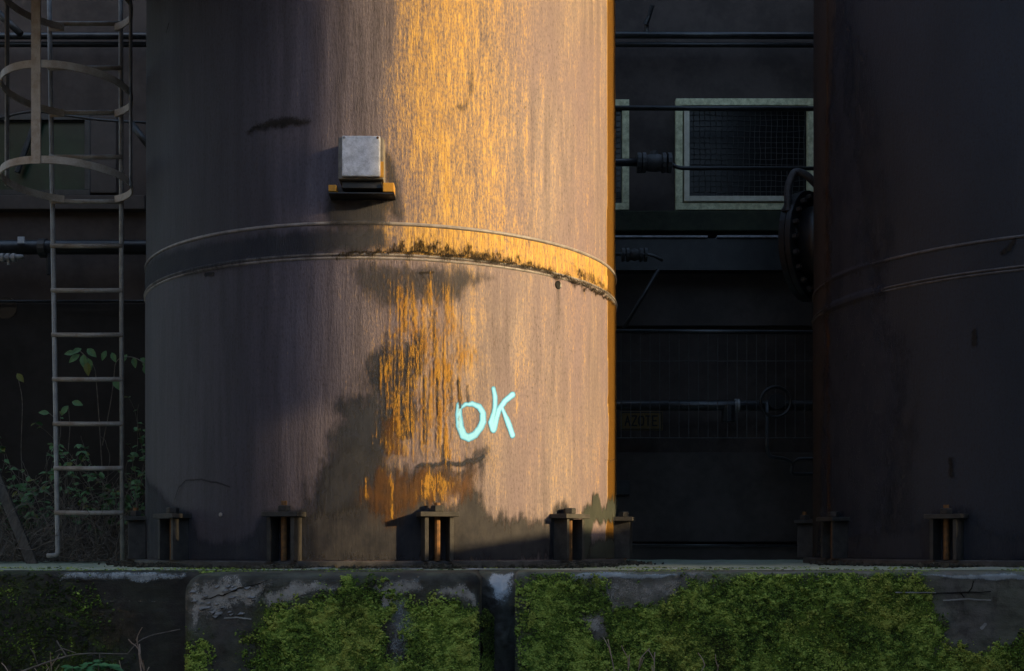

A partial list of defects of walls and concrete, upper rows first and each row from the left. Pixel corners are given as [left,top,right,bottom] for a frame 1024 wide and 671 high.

rust [360,272,478,526]
spalling [189,576,265,624]